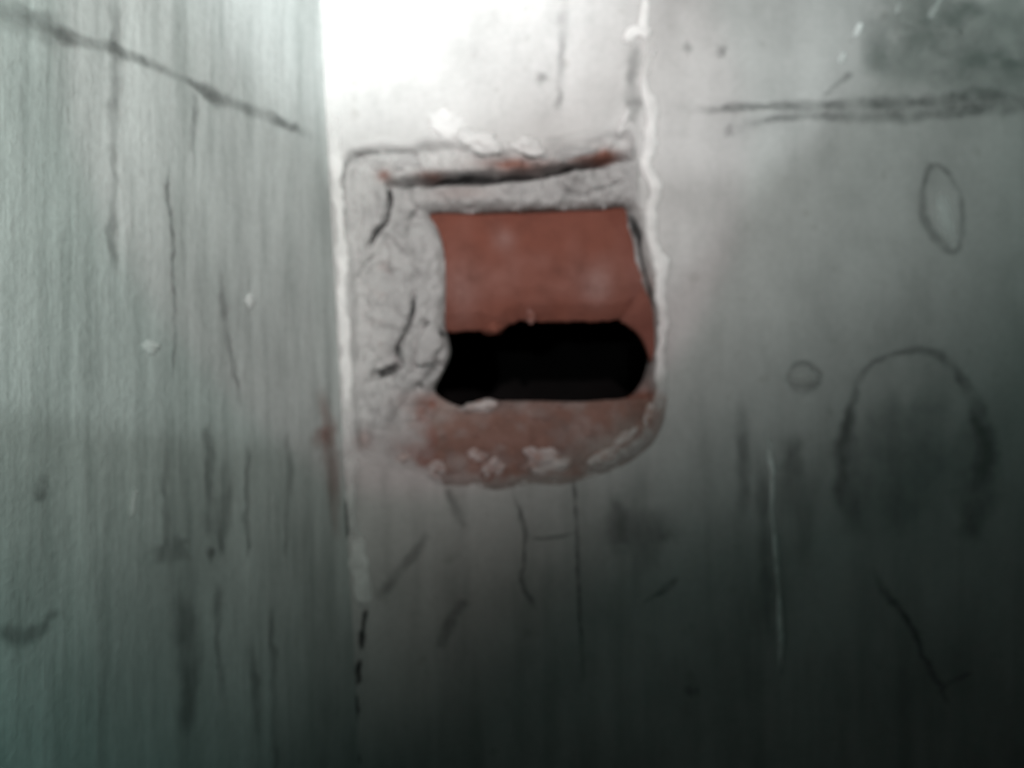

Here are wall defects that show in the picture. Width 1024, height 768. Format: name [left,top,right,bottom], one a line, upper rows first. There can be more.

spalling [340,107,668,486]